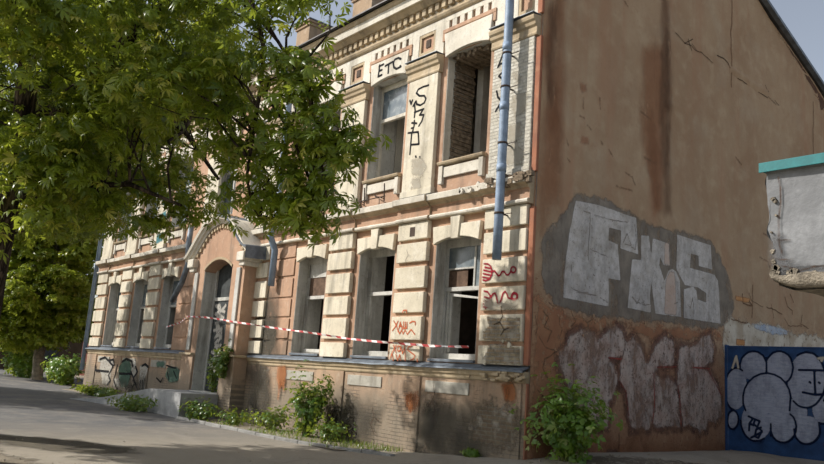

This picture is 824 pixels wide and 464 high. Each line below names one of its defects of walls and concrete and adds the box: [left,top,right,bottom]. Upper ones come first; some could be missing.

crack [676,8,778,104]
peeling [458,93,535,194]
leakage [644,52,662,207]
spalling [769,231,824,277]
leakage [253,298,276,355]
spalling [479,298,528,382]
peeling [723,315,824,358]
leakage [247,365,269,425]
leakage [325,403,376,441]
leakage [415,398,481,454]